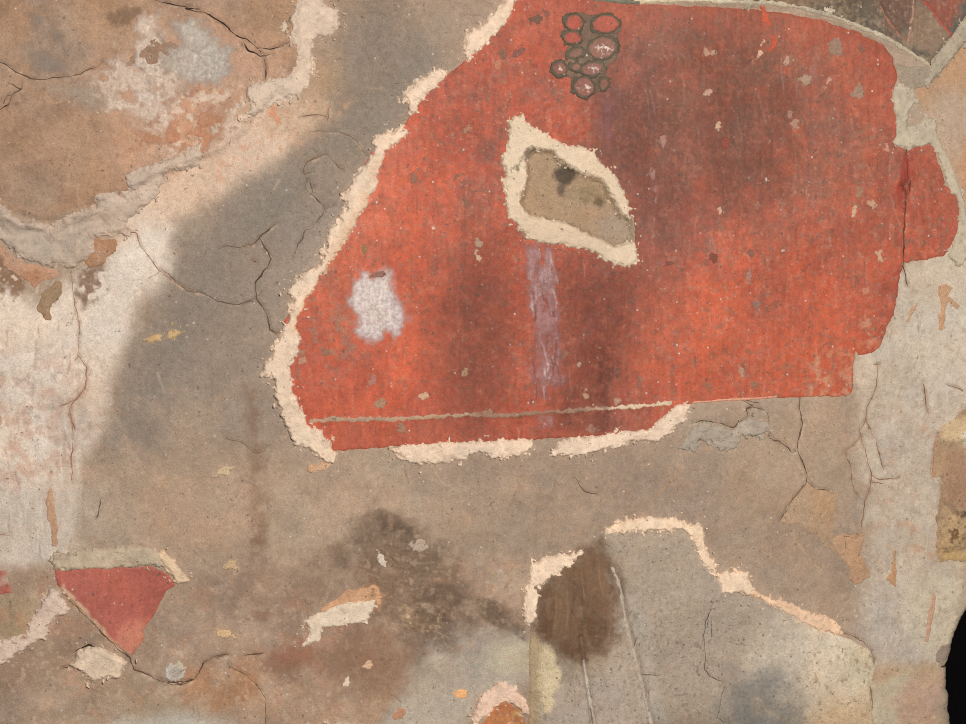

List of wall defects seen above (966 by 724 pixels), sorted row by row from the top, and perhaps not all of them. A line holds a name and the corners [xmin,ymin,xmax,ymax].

crack [156,0,287,78]
crack [0,60,106,110]
spalling [497,112,643,269]
flaking render [0,243,62,320]
flaking render [85,237,117,268]
peeling [346,270,404,353]
peeling [474,237,483,262]
crack [695,363,899,549]
flaking render [45,488,58,547]
flaking render [321,582,385,614]
crack [703,606,725,722]
crack [845,633,875,709]